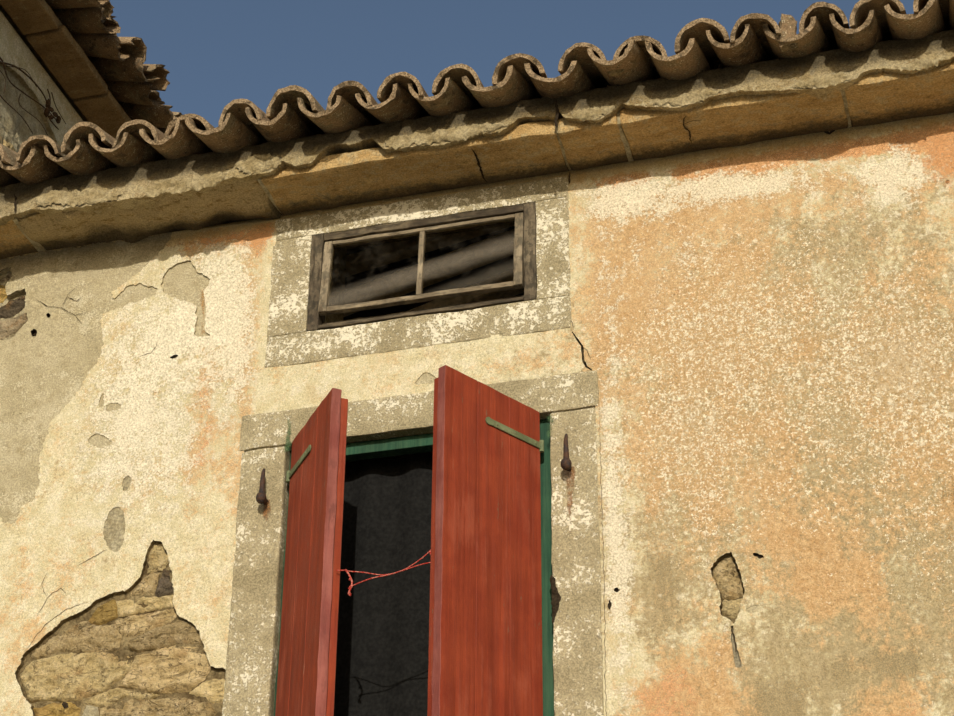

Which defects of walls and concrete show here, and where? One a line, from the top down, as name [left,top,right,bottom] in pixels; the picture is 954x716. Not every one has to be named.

peeling [0,232,210,524]
crack [571,321,592,370]
flaking render [15,540,226,716]
spalling [711,552,760,668]